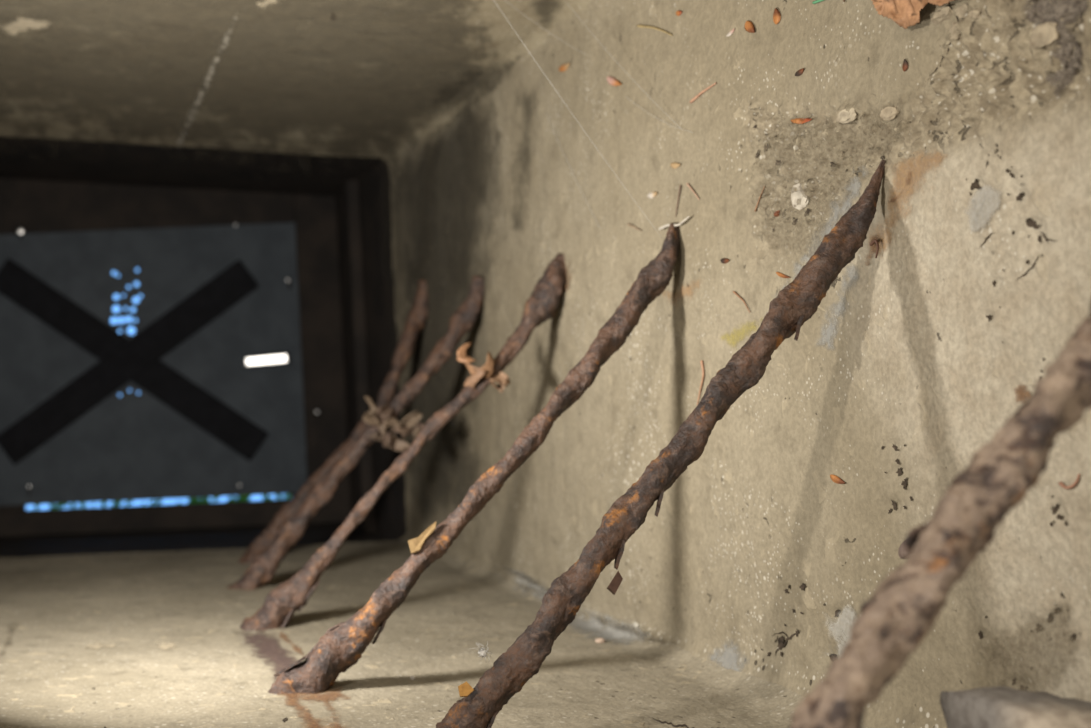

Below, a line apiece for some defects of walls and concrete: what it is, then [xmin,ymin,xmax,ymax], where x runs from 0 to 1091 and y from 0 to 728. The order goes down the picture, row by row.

spalling [930,3,981,40]
spalling [1023,0,1088,96]
leakage [0,0,485,378]
leakage [408,342,471,424]
leakage [408,416,470,512]
rust [904,519,931,552]
rust [245,622,344,679]
rust [280,689,348,728]